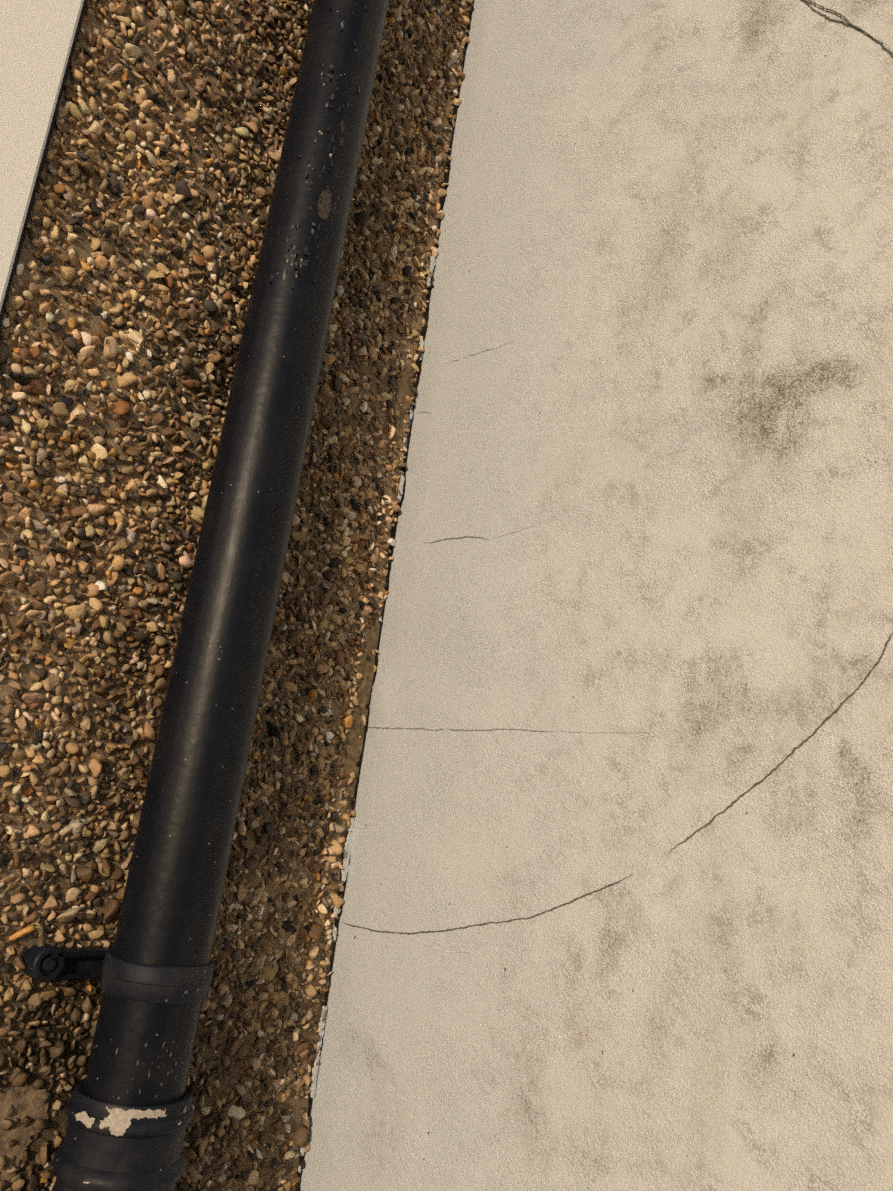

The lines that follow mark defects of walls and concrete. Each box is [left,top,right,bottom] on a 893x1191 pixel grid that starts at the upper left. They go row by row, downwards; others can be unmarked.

crack [803,0,893,57]
crack [308,0,639,1116]
crack [667,633,893,855]
crack [295,1155,304,1191]